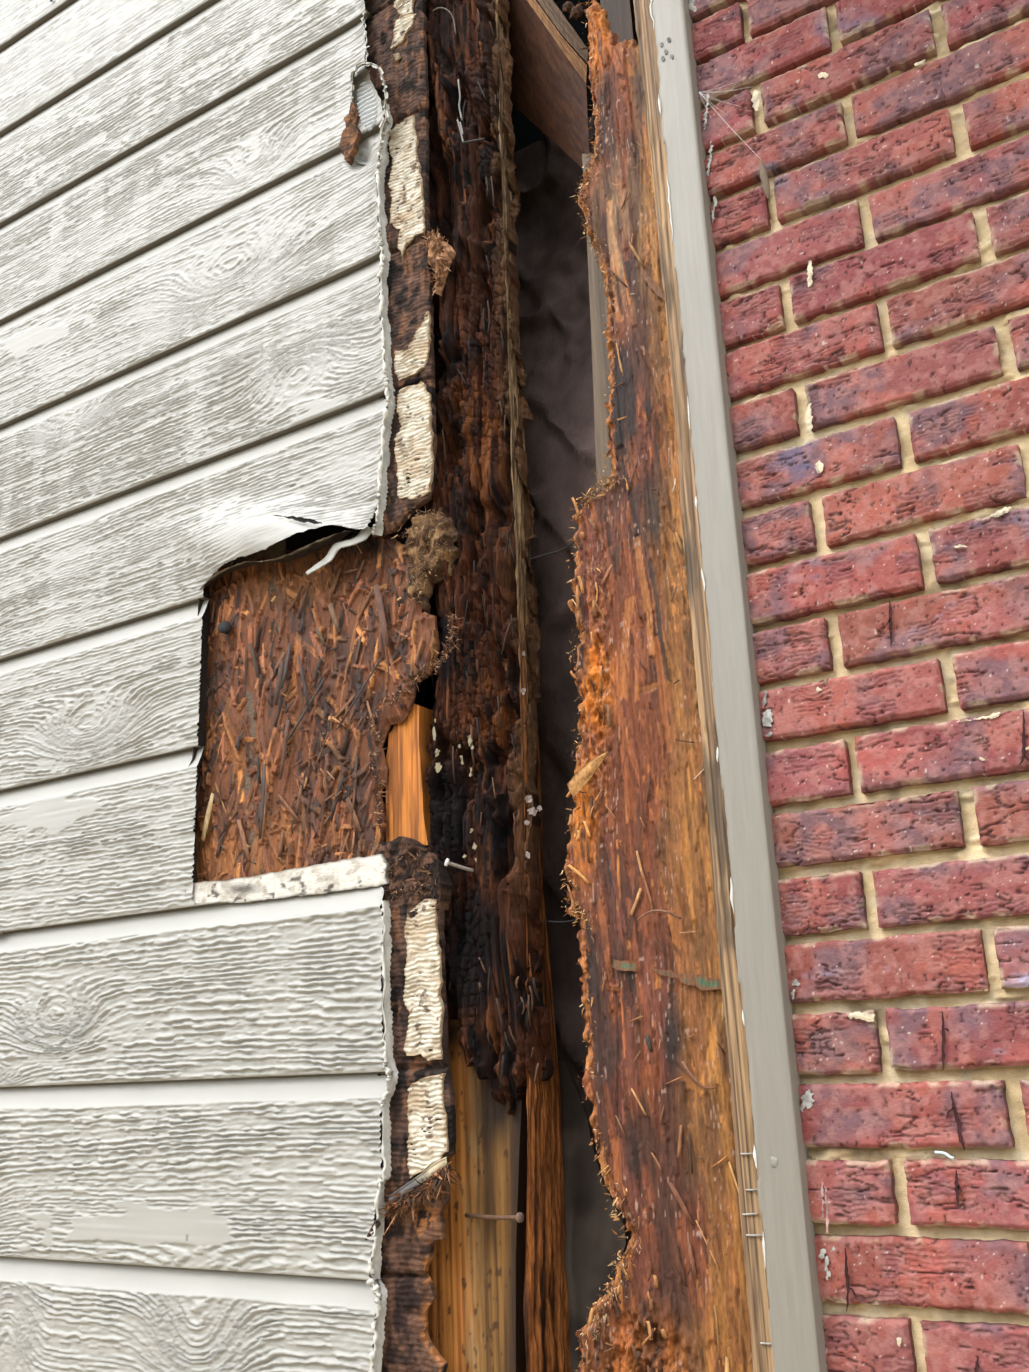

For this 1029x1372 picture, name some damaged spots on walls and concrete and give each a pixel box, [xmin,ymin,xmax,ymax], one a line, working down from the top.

peeling [339,0,435,536]
crack [274,515,322,524]
damp [432,719,442,773]
damp [612,959,721,990]
peeling [366,899,449,1372]